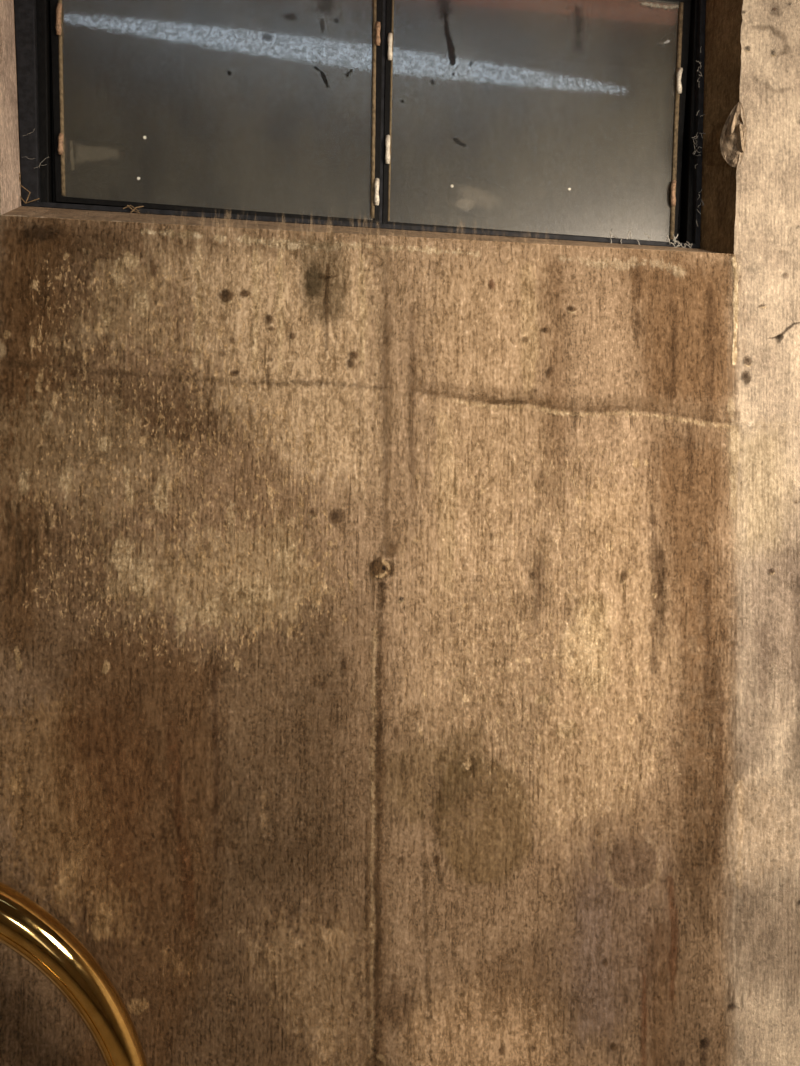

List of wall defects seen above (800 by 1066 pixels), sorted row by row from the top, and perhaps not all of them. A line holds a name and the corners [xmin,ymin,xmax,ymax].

leakage [0,215,734,1066]
crack [774,322,799,343]